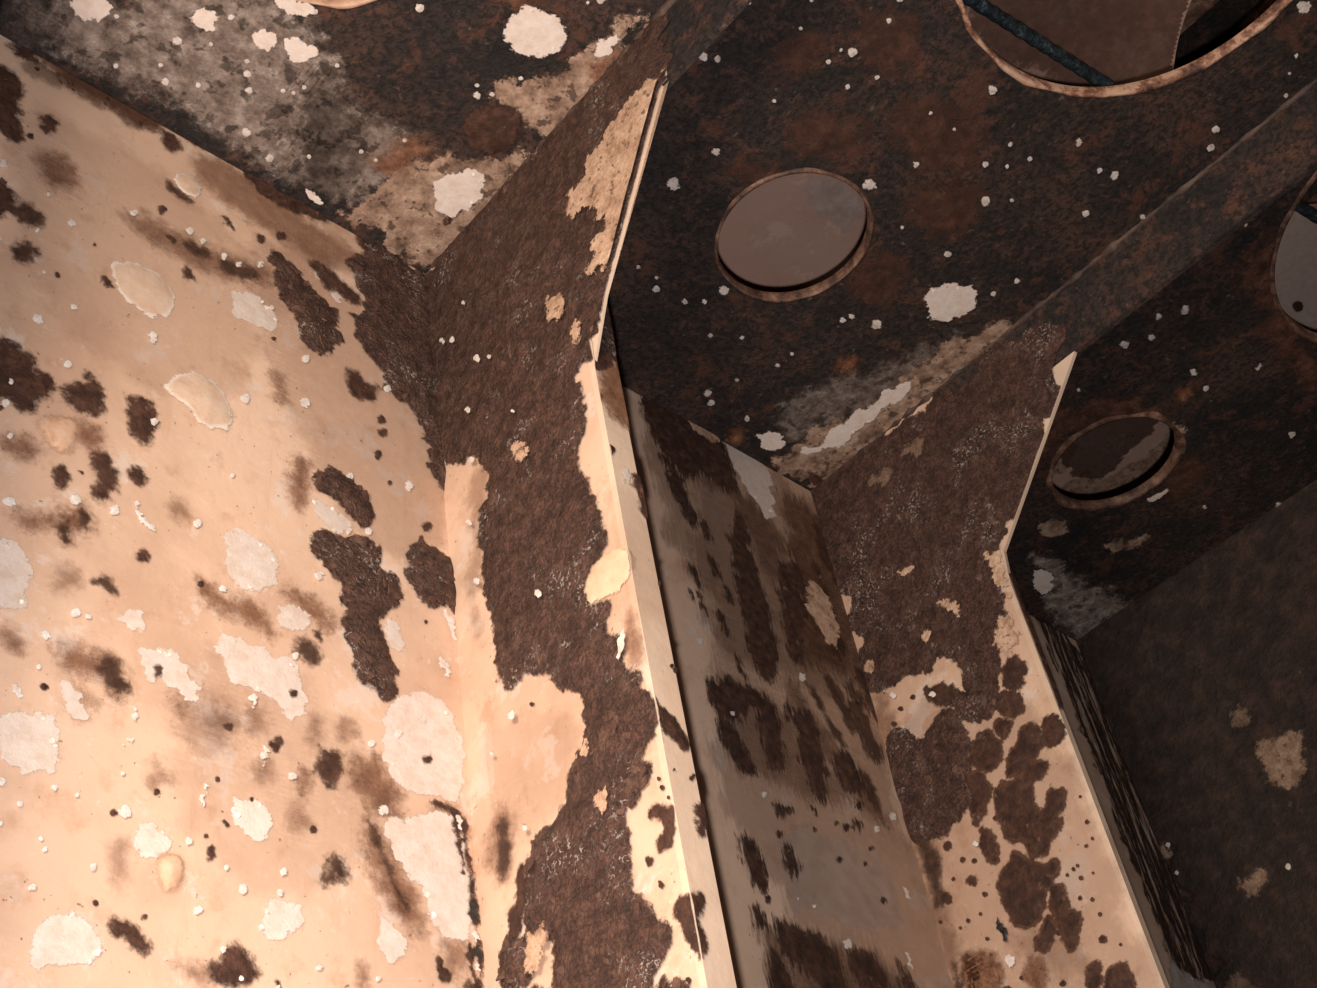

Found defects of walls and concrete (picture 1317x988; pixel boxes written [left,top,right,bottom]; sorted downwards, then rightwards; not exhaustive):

peeling [503,4,567,59]
peeling [433,168,486,218]
peeling [923,282,996,322]
corrosion [0,13,709,988]
peeling [214,633,309,722]
corrosion [638,322,1317,988]